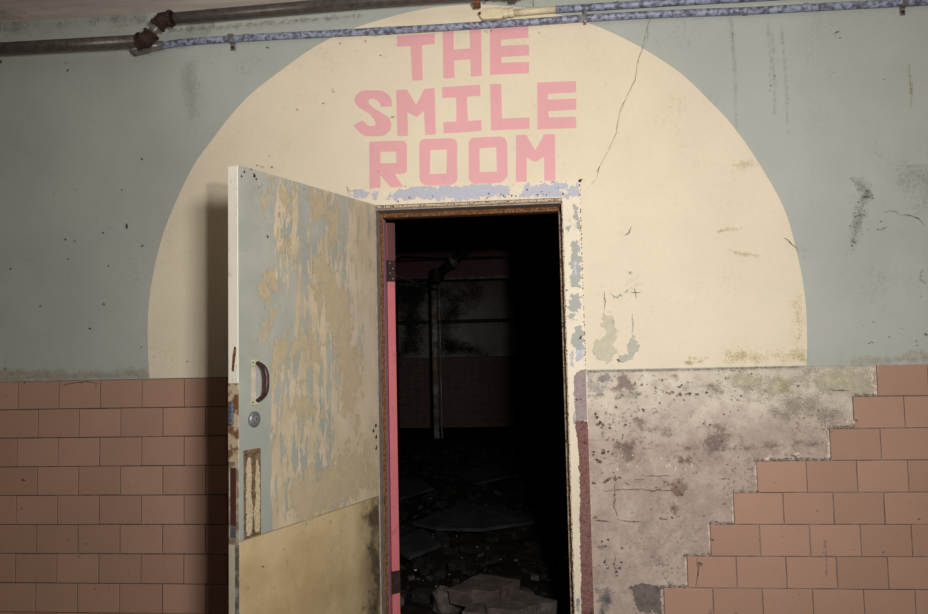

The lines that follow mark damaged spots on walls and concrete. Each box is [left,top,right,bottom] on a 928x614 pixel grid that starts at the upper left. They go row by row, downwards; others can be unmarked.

crack [590,8,654,185]
spalling [349,181,876,614]